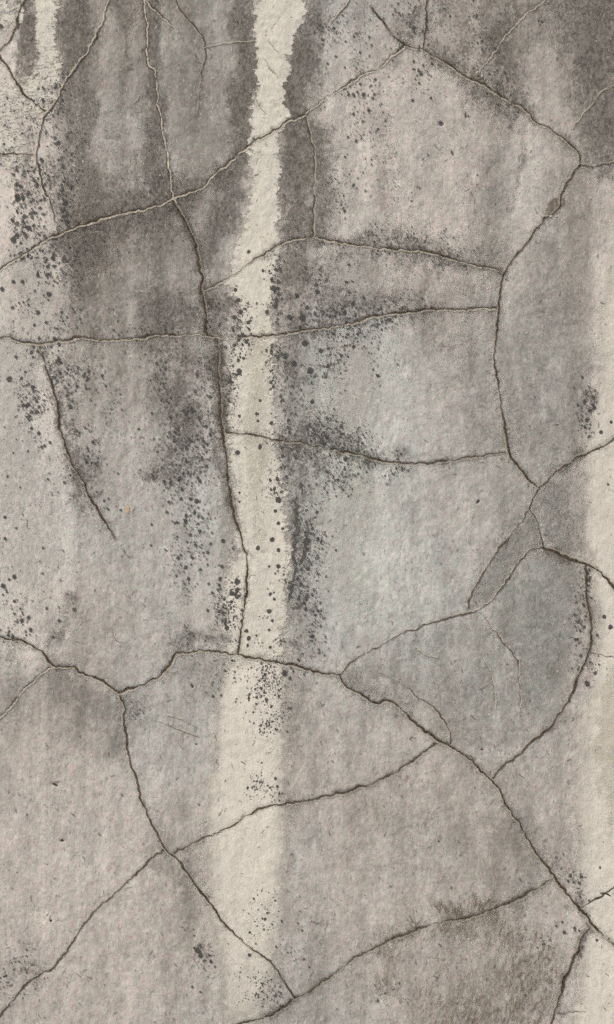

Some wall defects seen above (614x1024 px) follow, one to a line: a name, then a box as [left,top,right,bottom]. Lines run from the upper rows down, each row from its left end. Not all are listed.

crack [215,98,327,176]
crack [327,0,614,215]
water stain [557,0,614,180]
water stain [0,0,203,649]
crack [0,0,256,653]
crack [225,191,614,531]
water stain [109,0,530,1024]
crack [340,601,491,674]
crack [468,533,512,608]
crack [492,534,614,778]
crack [0,636,602,1024]
crack [582,887,614,907]